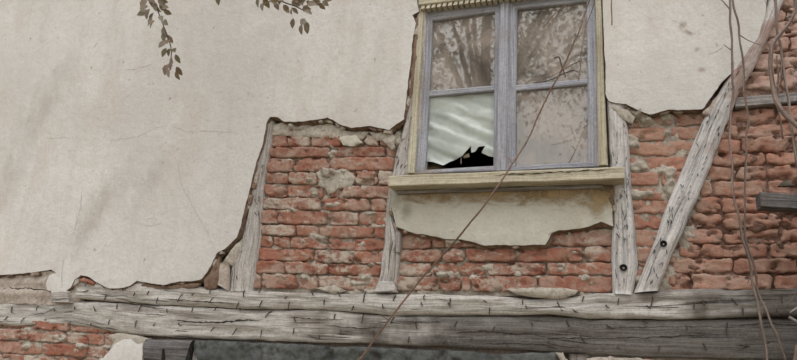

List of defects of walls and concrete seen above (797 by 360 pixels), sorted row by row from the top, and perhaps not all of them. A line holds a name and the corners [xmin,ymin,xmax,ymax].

spalling [0,270,56,292]
spalling [67,0,420,291]